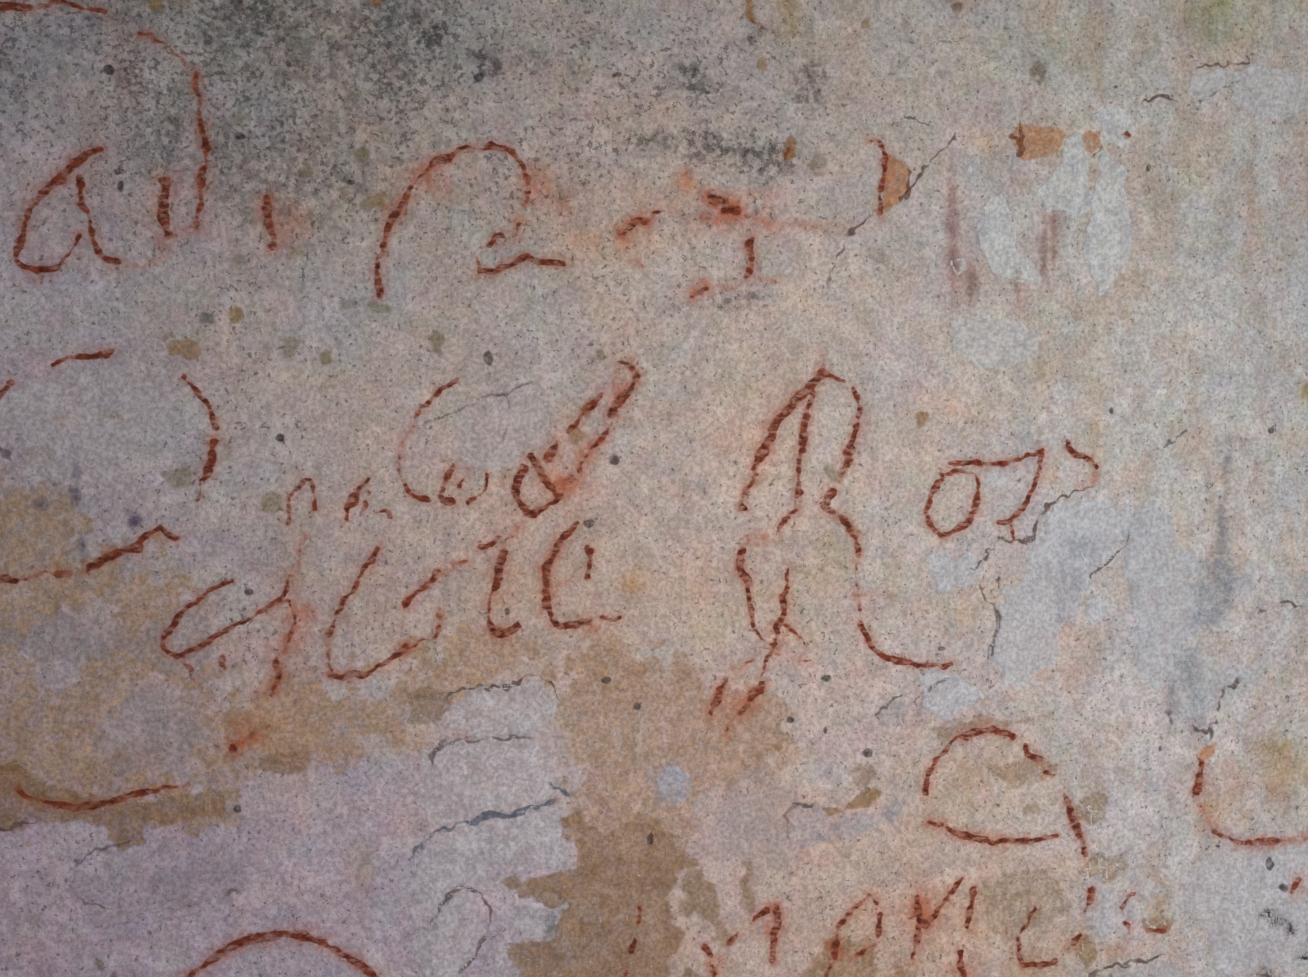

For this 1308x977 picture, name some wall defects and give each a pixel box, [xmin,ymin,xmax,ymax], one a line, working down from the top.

flaking render [951,258,966,274]
flaking render [978,195,1041,283]
flaking render [1032,105,1138,295]
crack [413,783,569,853]